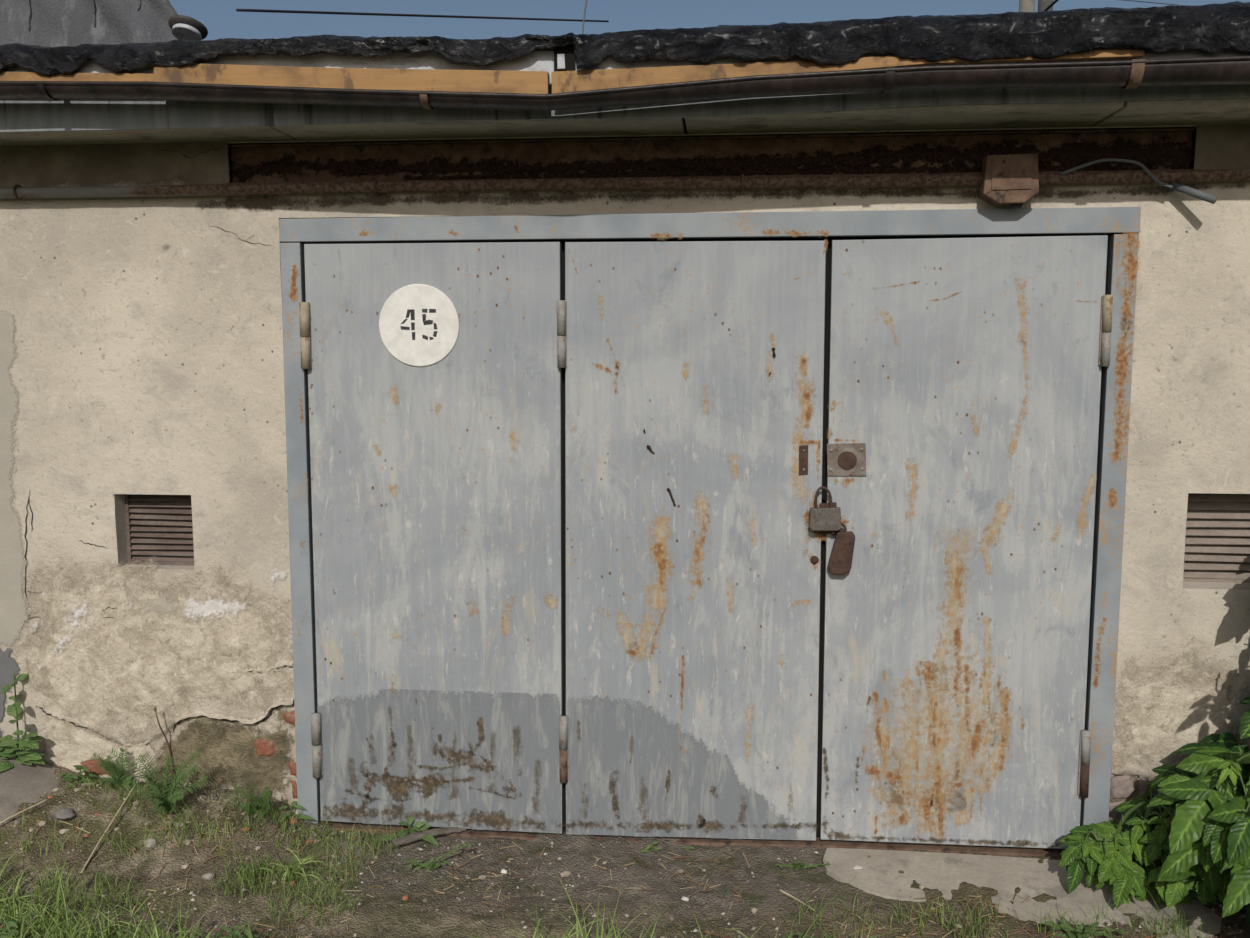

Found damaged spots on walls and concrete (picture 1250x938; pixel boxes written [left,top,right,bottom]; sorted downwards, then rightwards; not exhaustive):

corrosion [196,136,1211,211]
damp [1194,124,1250,170]
corrosion [1113,232,1140,461]
corrosion [793,355,854,540]
crack [19,491,42,633]
corrosion [618,488,676,659]
crack [39,707,119,744]
flaking render [13,559,297,798]
crack [173,704,294,732]
damp [317,689,797,840]
corrosion [568,781,745,832]
corrosion [762,555,1037,847]